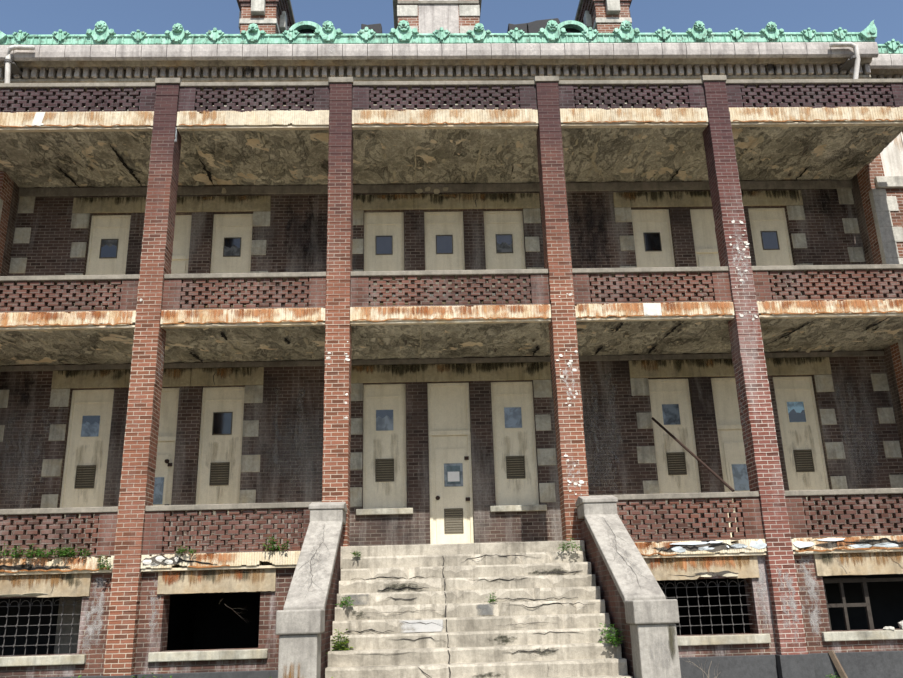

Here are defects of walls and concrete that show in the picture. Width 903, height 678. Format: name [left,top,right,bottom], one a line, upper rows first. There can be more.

rust [354,110,536,125]
crack [109,143,144,186]
crack [199,159,215,187]
leakage [353,193,531,202]
rust [0,311,132,327]
rust [352,304,549,322]
rust [761,300,903,315]
spalling [654,539,767,553]
spalling [793,538,903,548]
spalling [141,555,217,566]
crack [461,554,588,676]
crack [340,576,447,678]